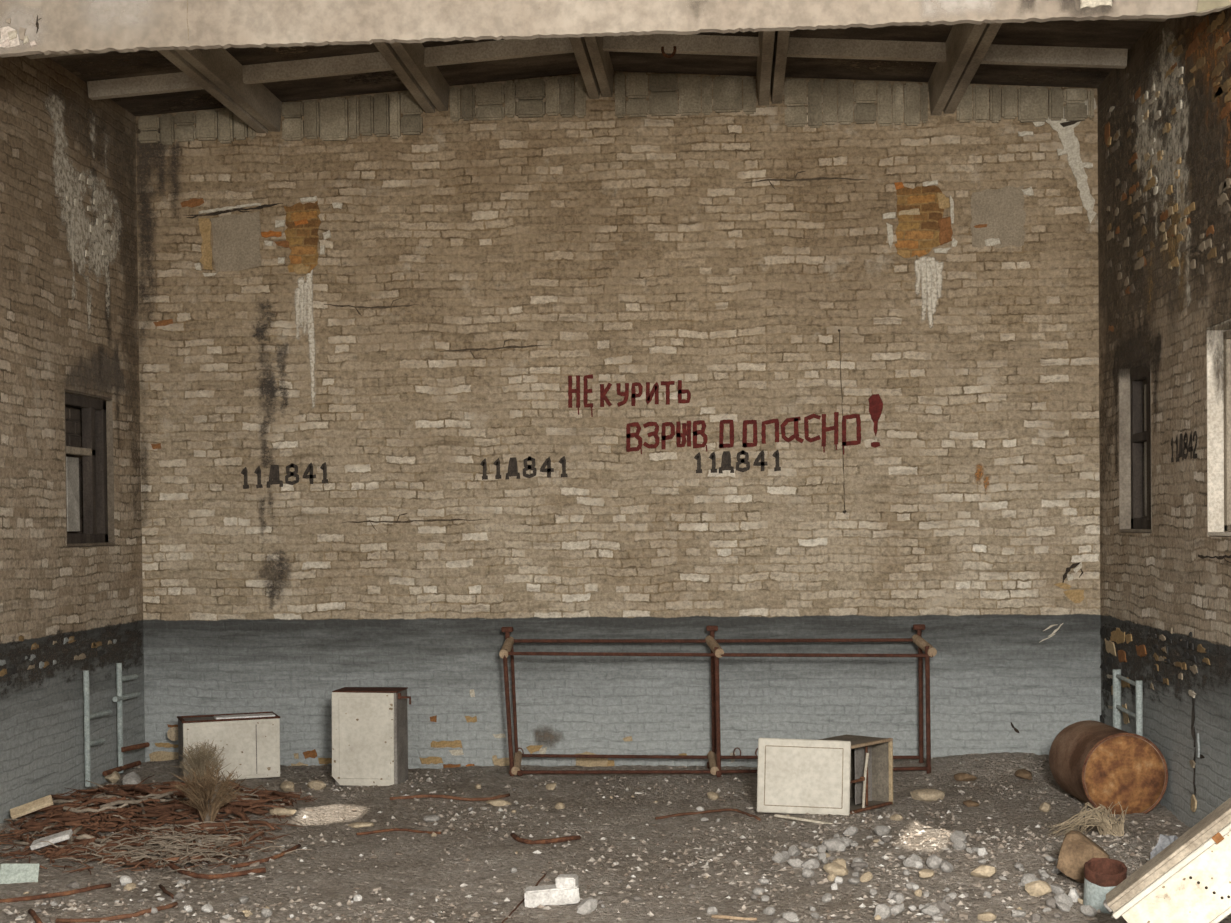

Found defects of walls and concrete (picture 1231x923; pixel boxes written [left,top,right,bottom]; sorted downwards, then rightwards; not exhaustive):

leakage [1063,0,1112,15]
leakage [45,95,121,363]
leakage [143,130,180,284]
spalling [261,196,343,274]
spalling [883,180,958,258]
peeling [1190,166,1231,275]
leakage [915,257,943,327]
leakage [277,269,315,407]
crack [1198,554,1231,563]
peeling [0,621,143,697]
peeling [1100,622,1231,812]